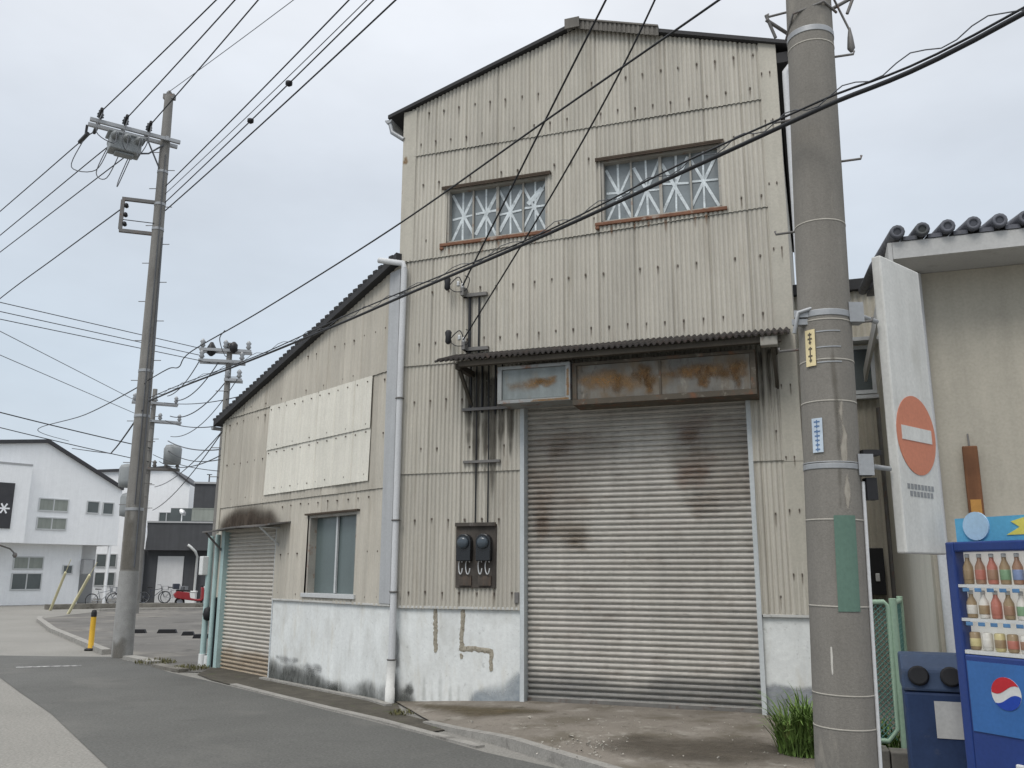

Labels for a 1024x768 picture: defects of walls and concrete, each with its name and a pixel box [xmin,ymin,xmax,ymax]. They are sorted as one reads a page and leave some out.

corrosion [527,369,569,402]
corrosion [633,361,746,392]
crack [433,609,494,671]
damp [269,658,343,692]
damp [356,685,375,698]